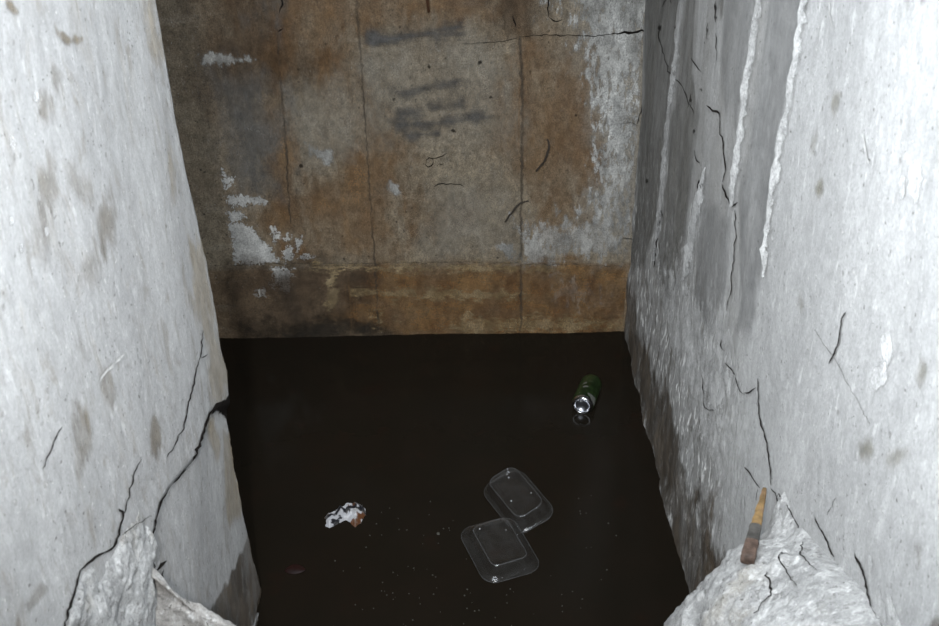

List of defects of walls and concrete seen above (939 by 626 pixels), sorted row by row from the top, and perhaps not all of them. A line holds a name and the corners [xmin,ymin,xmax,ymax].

damp [203,51,251,64]
damp [226,0,724,593]
crack [473,0,737,309]
crack [64,333,221,626]
damp [211,554,261,626]
crack [720,340,881,624]